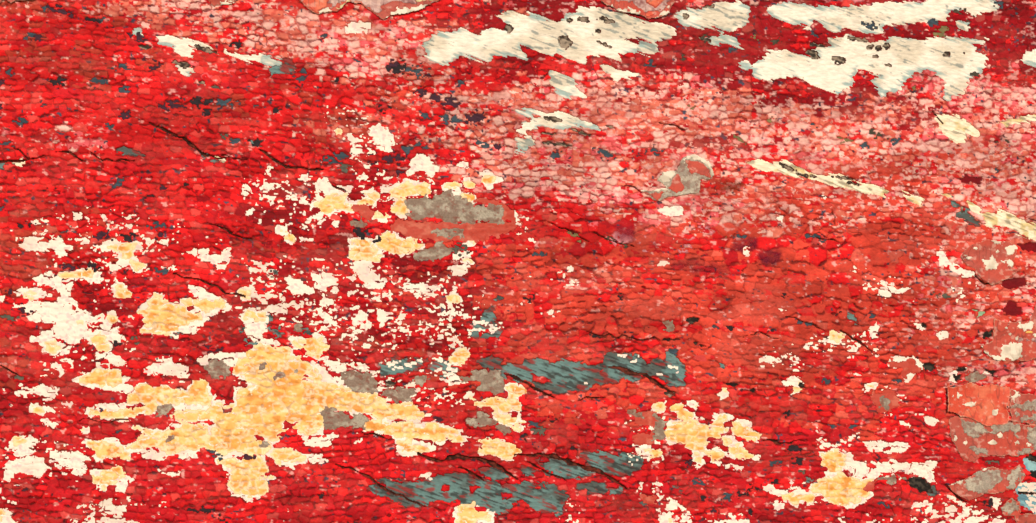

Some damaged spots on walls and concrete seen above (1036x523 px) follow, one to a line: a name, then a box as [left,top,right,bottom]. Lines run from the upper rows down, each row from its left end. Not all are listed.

peeling [42,4,109,24]
peeling [300,0,438,34]
peeling [385,0,1004,125]
crack [0,146,146,170]
crack [150,123,343,190]
peeling [0,105,1036,523]
crack [335,464,425,507]
crack [417,452,627,489]